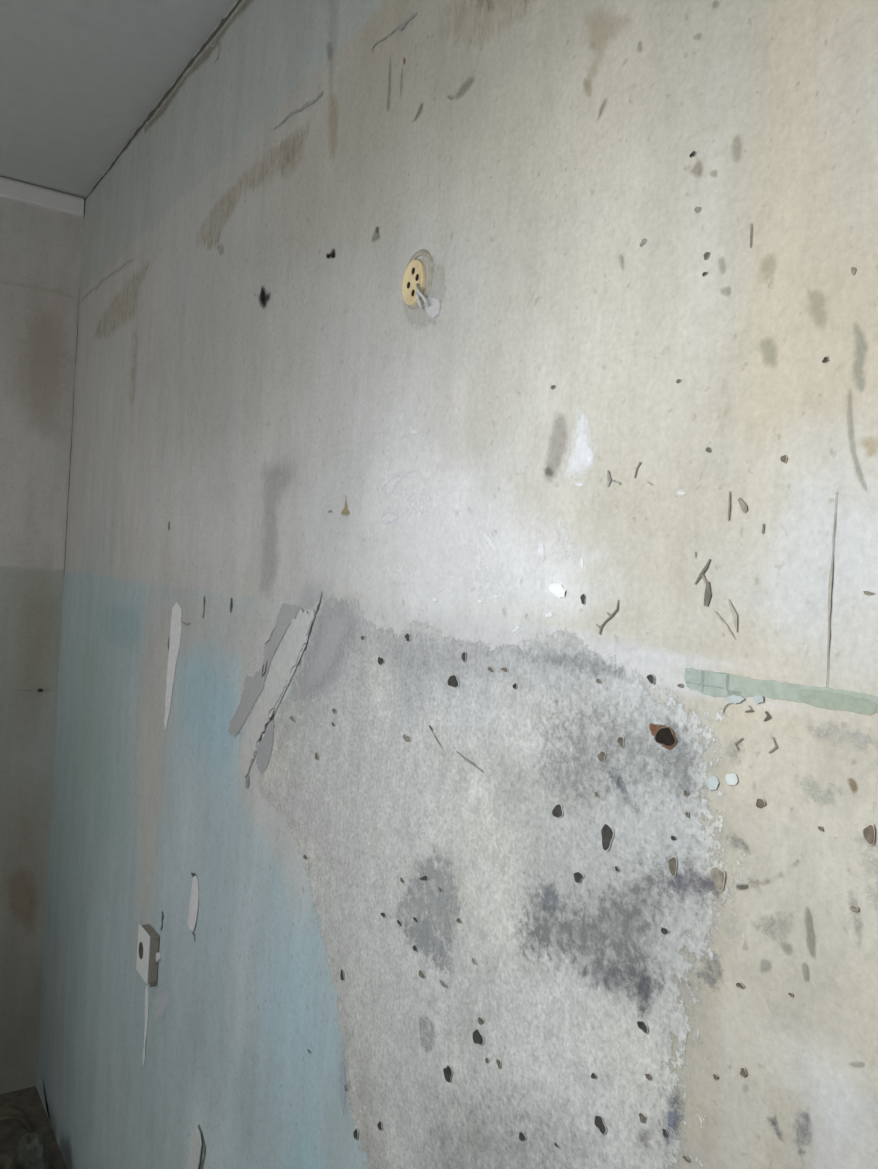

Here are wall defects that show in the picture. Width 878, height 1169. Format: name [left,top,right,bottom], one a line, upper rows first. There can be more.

peeling [548,583,567,598]
peeling [164,602,190,731]
peeling [188,872,199,942]
damp [398,858,460,970]
spalling [228,592,765,1169]
damp [520,875,715,1013]
peeling [187,1124,206,1169]